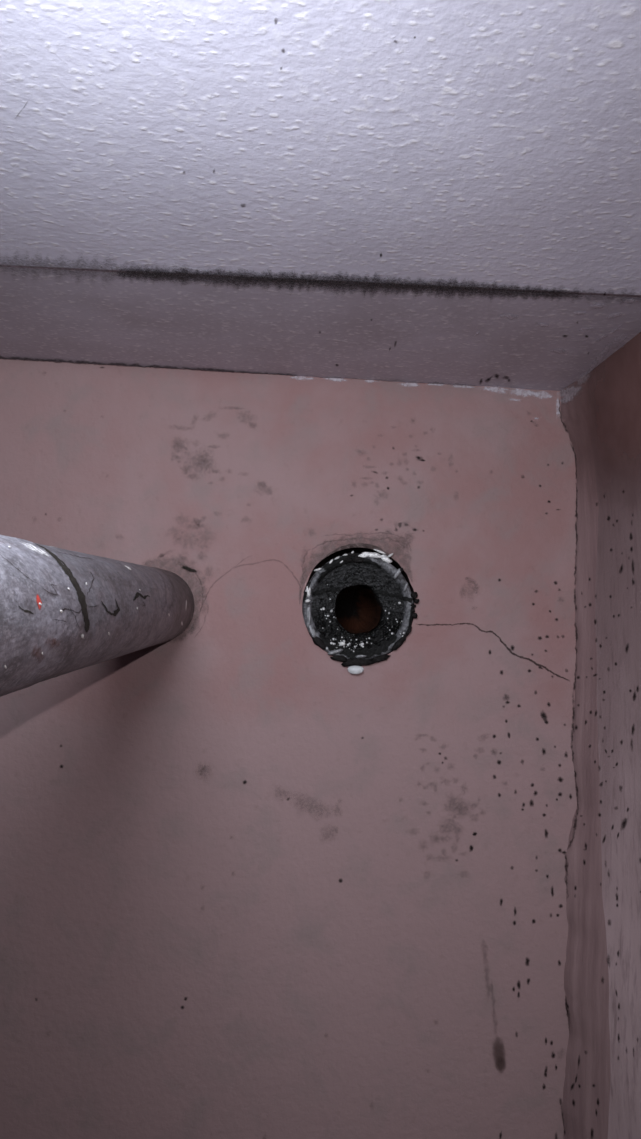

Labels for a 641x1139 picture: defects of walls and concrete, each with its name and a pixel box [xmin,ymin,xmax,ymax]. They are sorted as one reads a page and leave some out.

crack [419,400,578,885]
water stain [495,1043,504,1070]